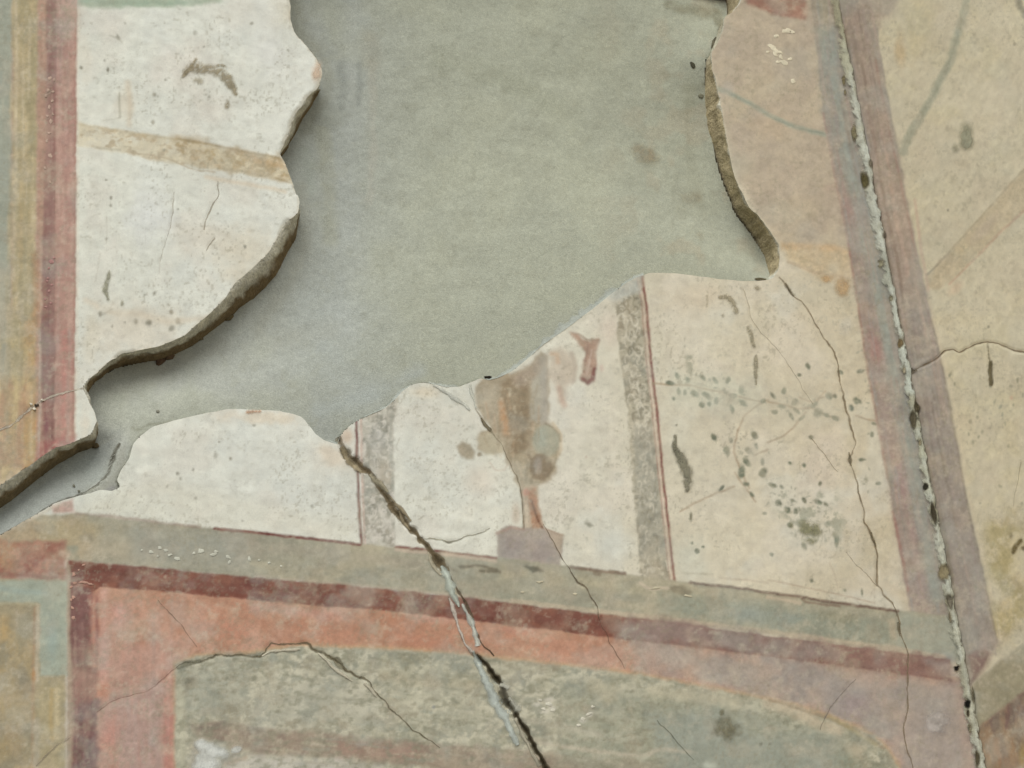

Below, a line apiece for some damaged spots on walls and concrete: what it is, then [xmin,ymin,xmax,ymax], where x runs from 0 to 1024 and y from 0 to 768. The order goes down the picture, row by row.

crack [158,600,440,748]
flaking render [0,0,780,535]
crack [336,436,550,768]
crack [782,280,913,767]
crack [830,0,1024,768]